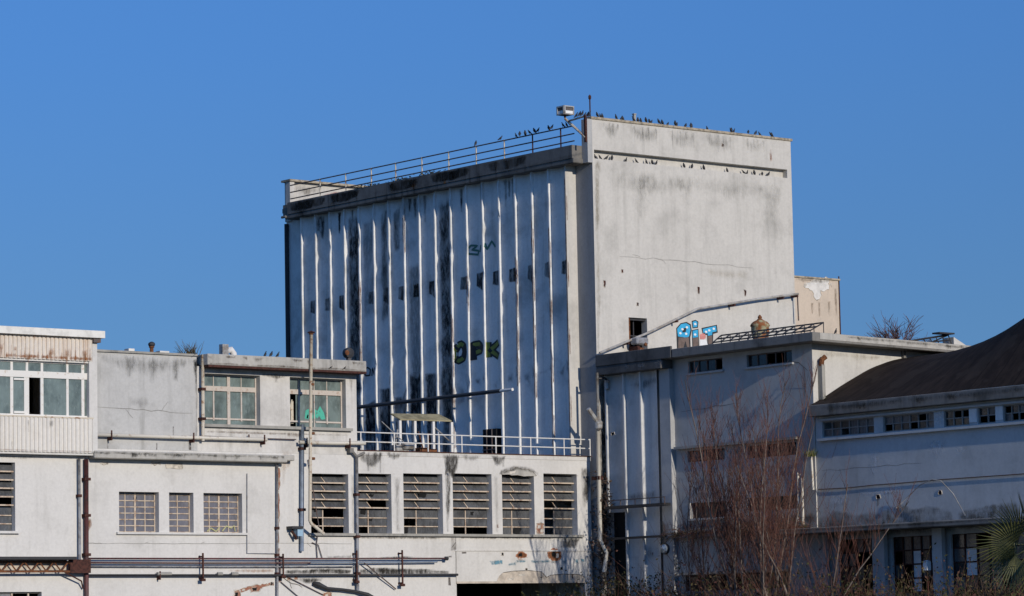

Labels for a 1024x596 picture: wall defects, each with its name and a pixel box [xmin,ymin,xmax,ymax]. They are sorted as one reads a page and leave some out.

water stain [432,168,467,182]
water stain [391,180,426,209]
crack [620,254,748,268]
peeling [803,276,832,301]
water stain [291,190,532,513]
crack [103,403,174,418]
flaking render [497,547,585,581]